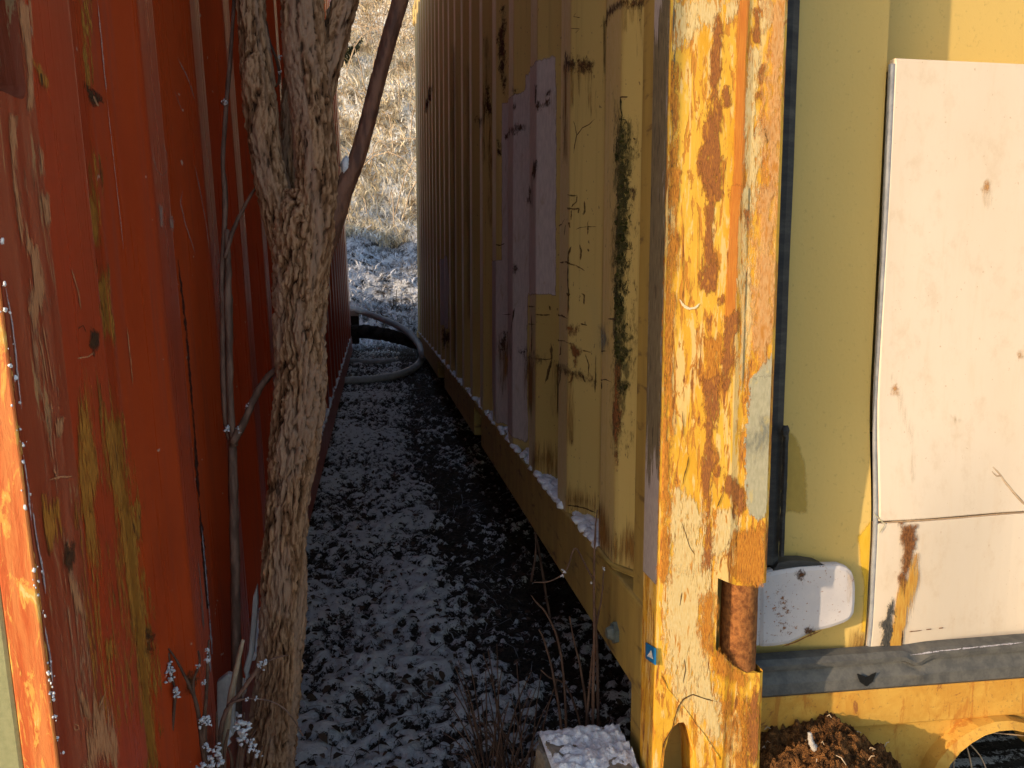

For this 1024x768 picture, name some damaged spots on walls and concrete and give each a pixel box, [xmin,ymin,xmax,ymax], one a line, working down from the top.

rust [564,0,644,153]
rust [751,8,764,45]
rust [755,63,767,101]
rust [696,16,746,570]
peeling [646,0,785,745]
rust [730,526,766,588]
rust [890,522,919,646]
rust [696,592,760,768]